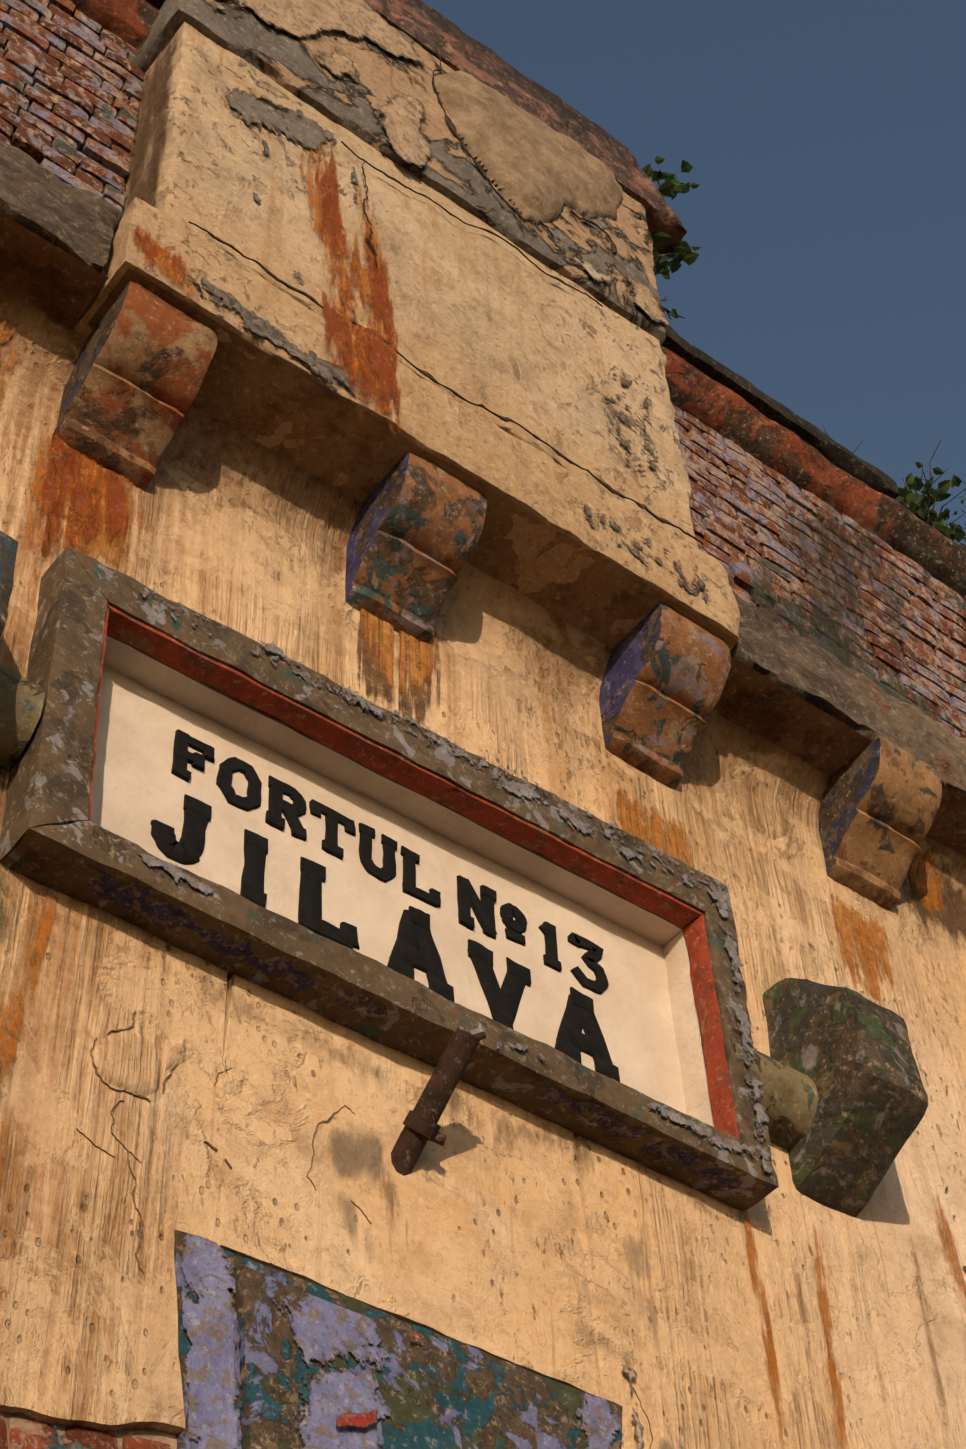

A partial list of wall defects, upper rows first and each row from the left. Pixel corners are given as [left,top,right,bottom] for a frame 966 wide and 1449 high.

flaking render [375,93,433,168]
rust [300,135,402,426]
flaking render [565,254,670,326]
crack [188,221,704,545]
rust [25,433,146,580]
rust [357,608,440,723]
crack [76,1100,144,1274]
crack [204,1141,232,1169]
peeling [180,1234,242,1449]
peeling [272,1293,391,1449]
peeling [576,1364,653,1449]
rust [743,1210,784,1447]